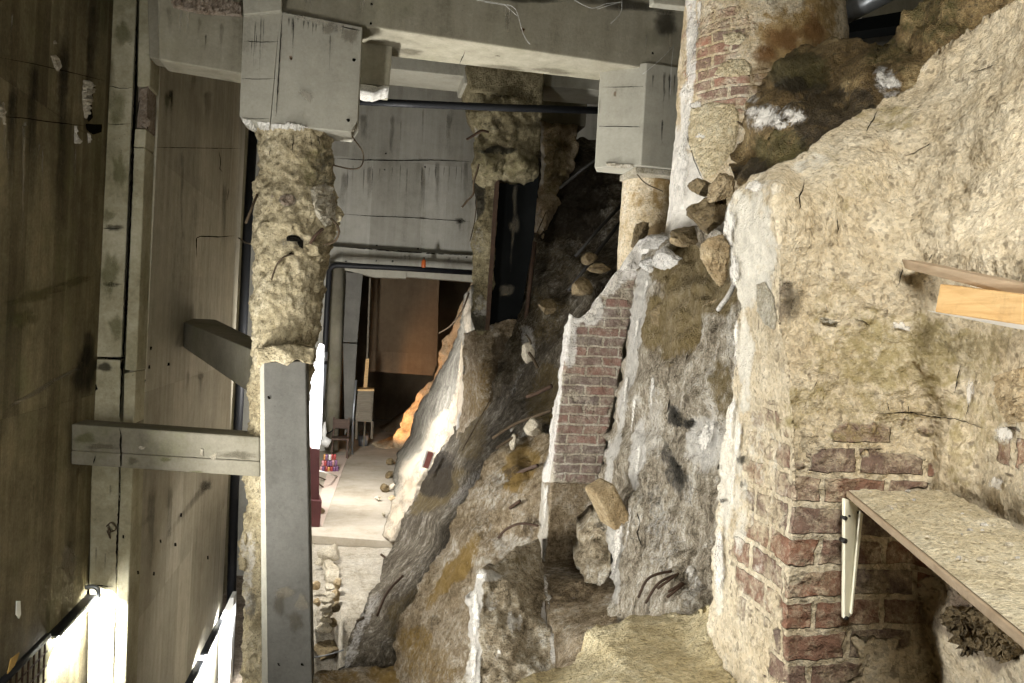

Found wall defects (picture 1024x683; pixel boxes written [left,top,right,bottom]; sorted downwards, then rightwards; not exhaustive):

spalling [242,119,308,131]
spalling [271,194,295,206]
spalling [286,235,303,254]
crack [866,366,981,428]